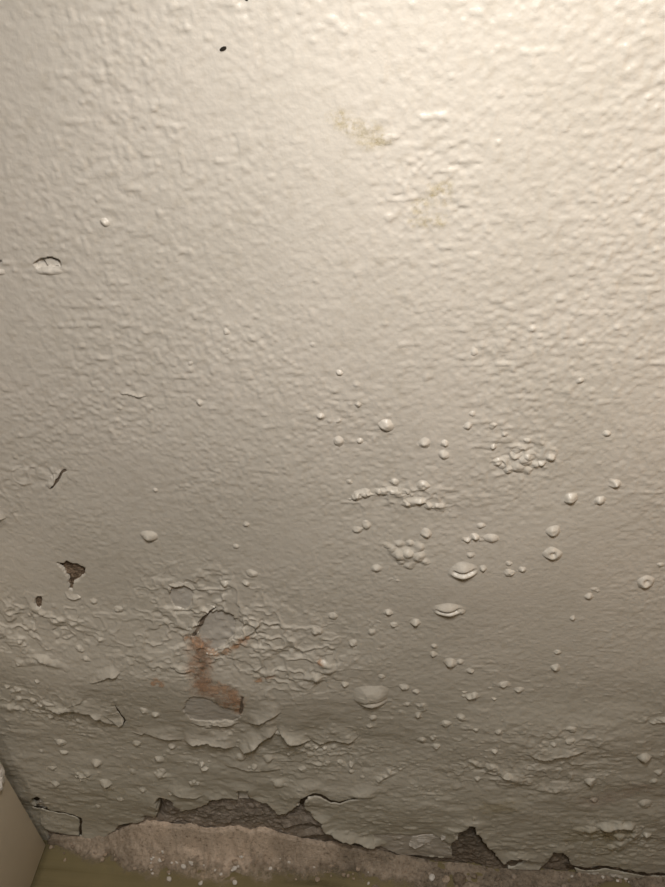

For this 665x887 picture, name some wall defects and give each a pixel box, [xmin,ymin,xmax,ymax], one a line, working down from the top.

crack [45,469,67,488]
peeling [60,561,85,600]
crack [192,607,216,636]
peeling [168,582,259,660]
peeling [37,663,359,755]
peeling [143,780,363,847]
crack [299,793,357,803]
peeling [375,827,624,879]
crack [566,863,665,876]